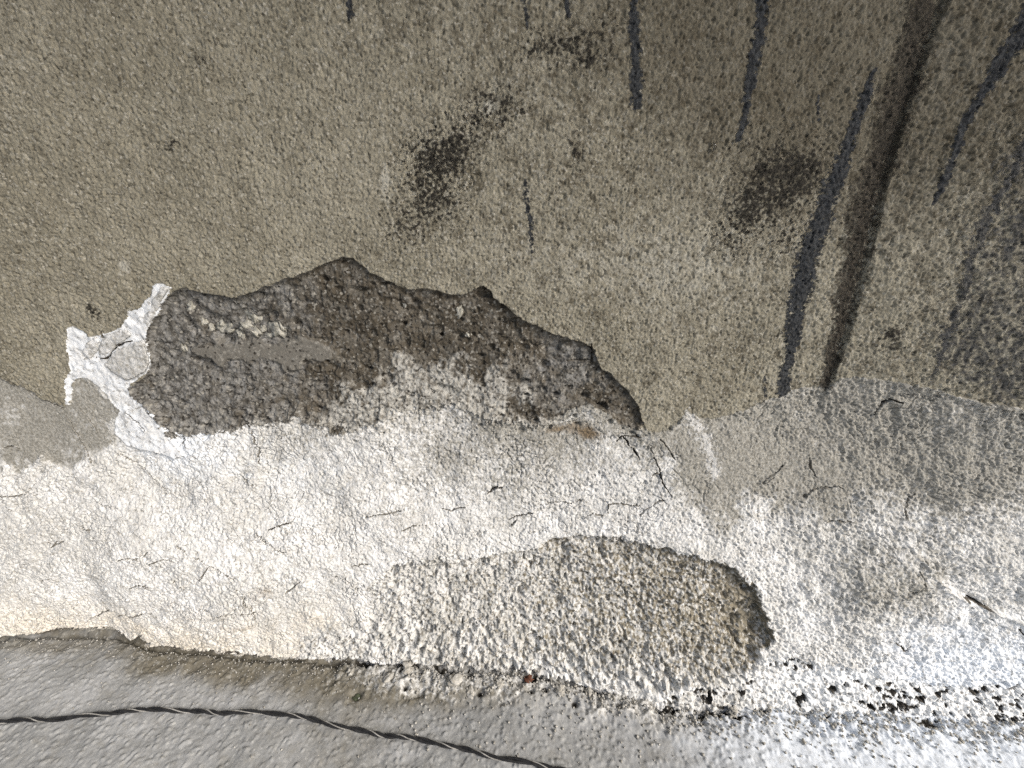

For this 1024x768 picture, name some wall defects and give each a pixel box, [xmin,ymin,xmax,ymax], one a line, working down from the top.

water stain [378,81,534,254]
water stain [702,0,948,403]
water stain [930,140,1024,417]
water stain [932,3,1024,205]
crack [365,507,465,531]
peeling [0,256,1024,725]
crack [508,434,676,526]